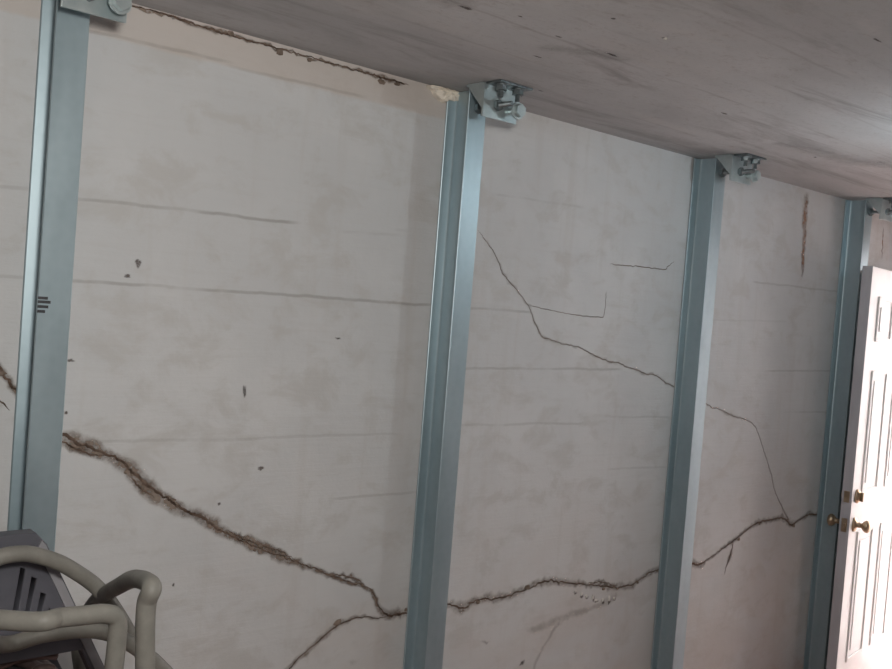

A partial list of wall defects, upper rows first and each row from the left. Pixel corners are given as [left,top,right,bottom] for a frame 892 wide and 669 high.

crack [132,5,405,86]
crack [480,233,674,387]
crack [0,366,16,410]
crack [62,432,407,669]
crack [447,569,659,612]
crack [692,403,817,569]